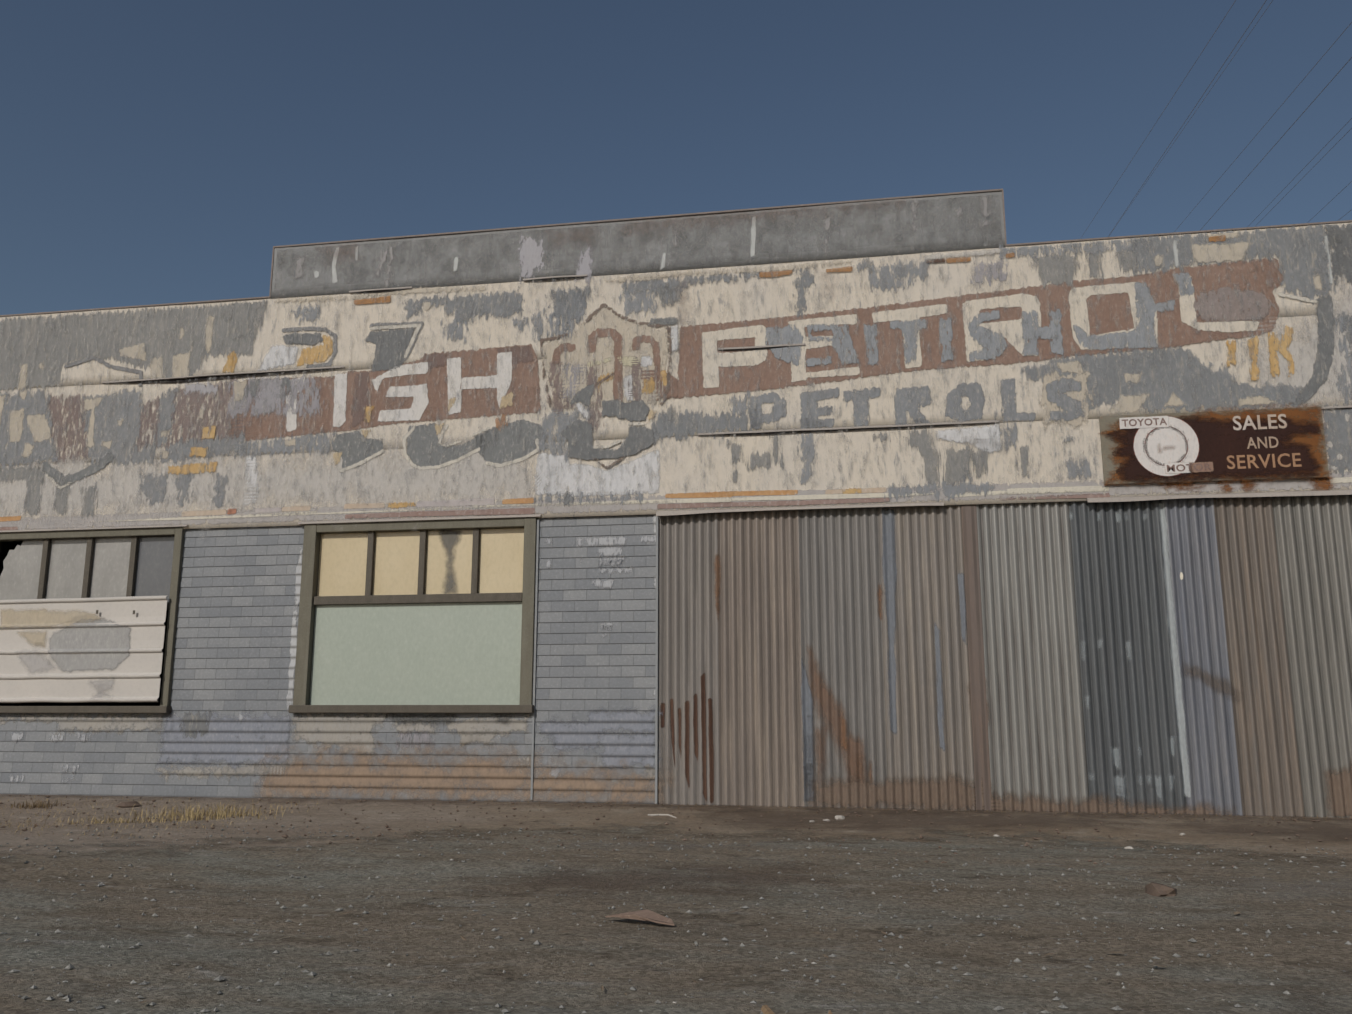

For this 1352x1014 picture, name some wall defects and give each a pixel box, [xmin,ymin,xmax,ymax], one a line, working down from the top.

peeling [402,285,592,344]
peeling [605,223,1352,318]
peeling [0,299,336,518]
peeling [651,390,815,485]
peeling [884,422,1029,502]
peeling [1021,346,1303,414]
corrosion [1311,477,1333,491]
peeling [1323,311,1352,477]
peeling [577,535,632,589]
peeling [0,549,661,781]
corrosion [660,673,714,803]
corrosion [809,651,872,782]